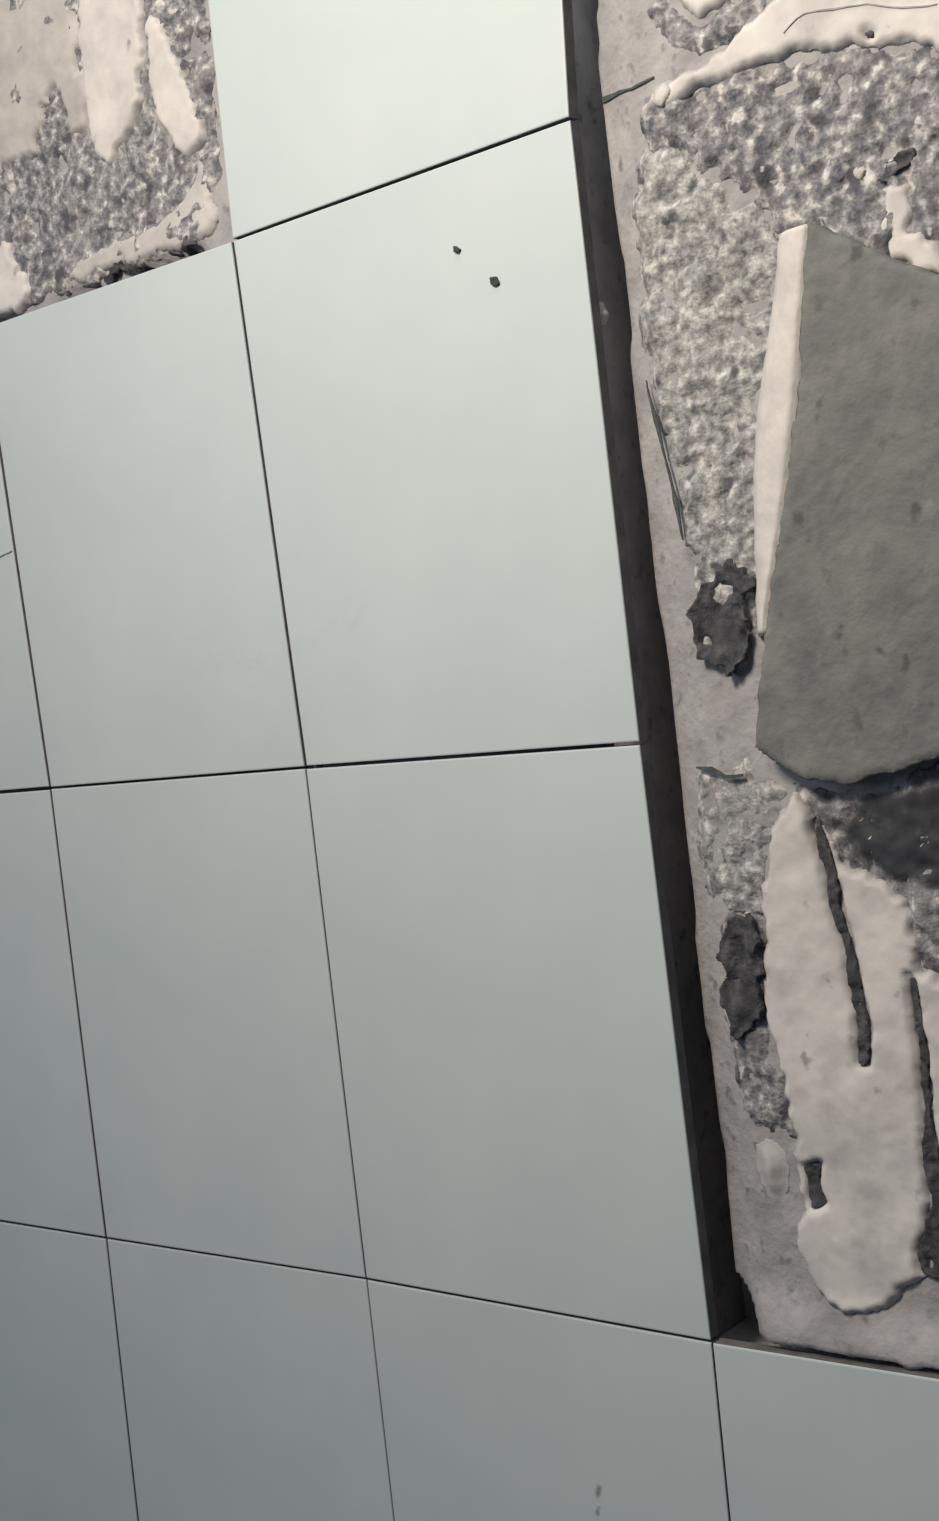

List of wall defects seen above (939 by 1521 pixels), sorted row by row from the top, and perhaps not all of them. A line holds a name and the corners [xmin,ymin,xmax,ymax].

spalling [0,0,223,322]
spalling [632,0,939,677]
flaking render [696,758,939,1315]